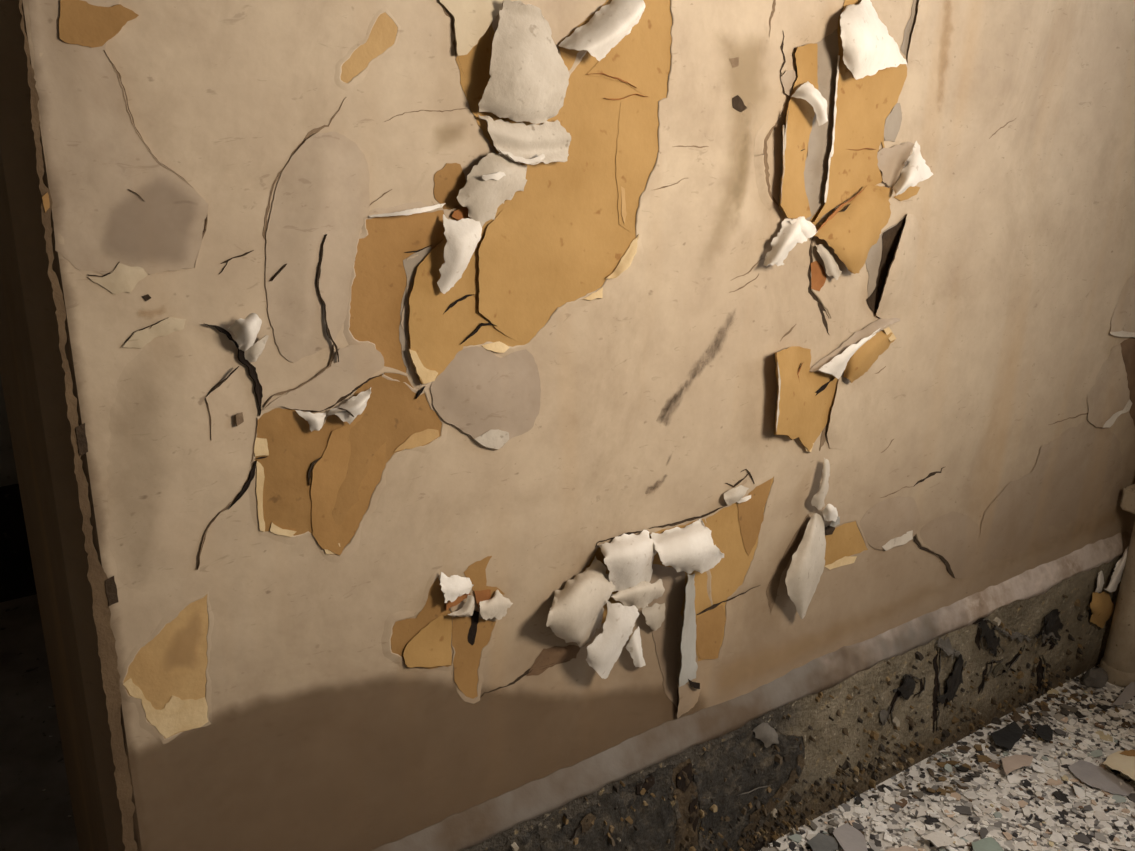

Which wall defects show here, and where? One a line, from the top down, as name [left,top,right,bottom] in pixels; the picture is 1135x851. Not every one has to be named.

peeling [18,0,214,851]
crack [205,313,269,416]
crack [228,460,257,510]
peeling [247,0,684,563]
peeling [526,0,933,718]
crack [781,238,836,340]
crack [914,527,955,578]
peeling [977,274,1135,563]
peeling [381,556,513,704]